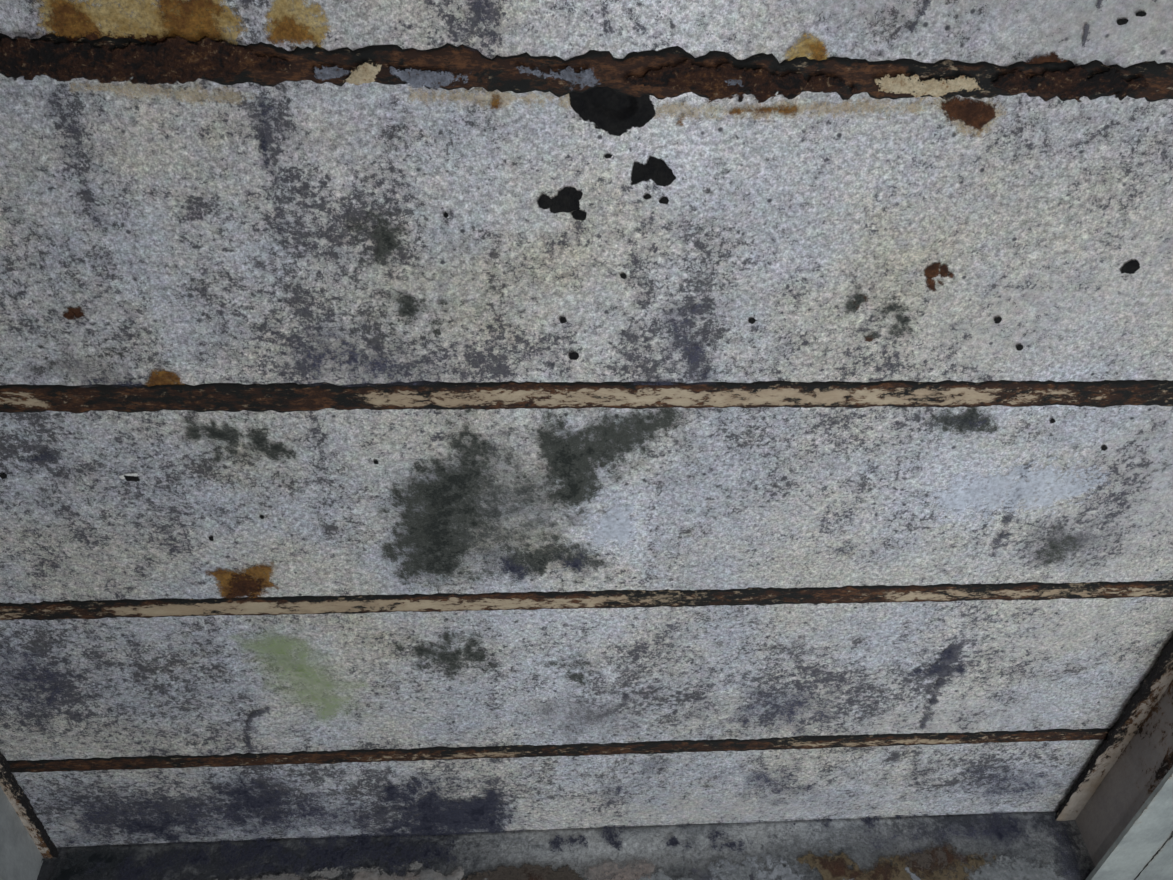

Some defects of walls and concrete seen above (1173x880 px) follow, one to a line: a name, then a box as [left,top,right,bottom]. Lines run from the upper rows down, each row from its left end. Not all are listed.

rust [0,0,331,85]
peeling [390,66,471,90]
hole [569,87,655,136]
rust [624,34,858,115]
rust [931,52,1149,131]
hole [631,156,676,204]
rust [146,369,184,387]
damp [382,407,688,588]
rust [206,562,279,599]